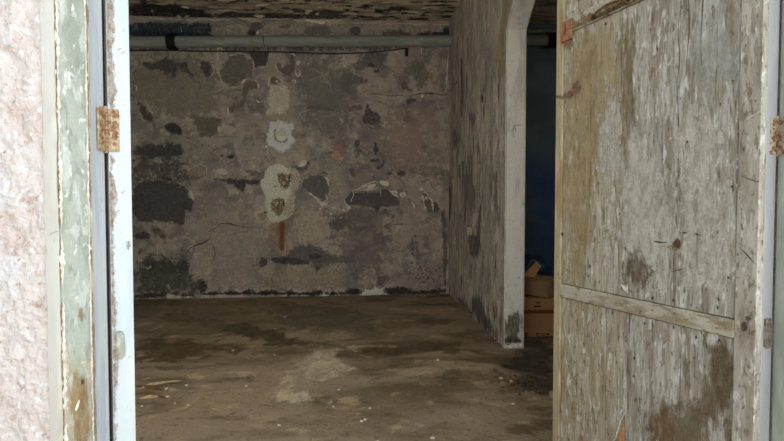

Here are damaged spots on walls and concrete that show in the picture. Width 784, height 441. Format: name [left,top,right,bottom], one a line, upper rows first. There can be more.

peeling [129,0,457,26]
flaking render [260,153,439,223]
crack [157,223,252,263]
water stain [459,277,523,345]